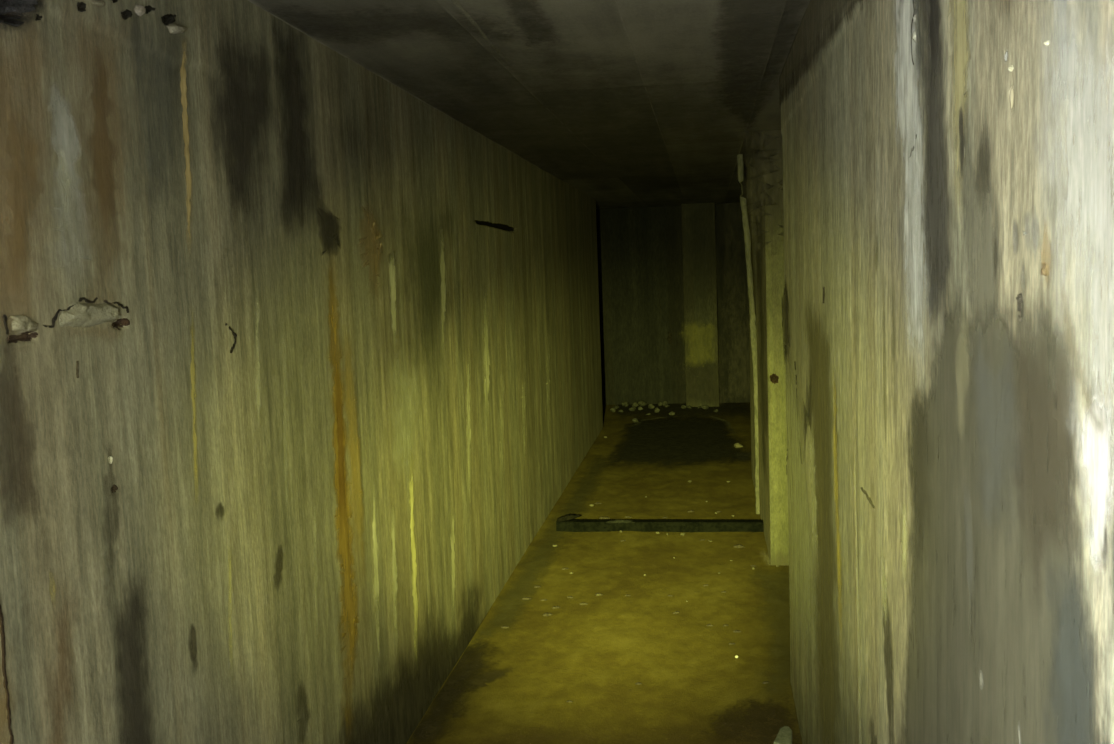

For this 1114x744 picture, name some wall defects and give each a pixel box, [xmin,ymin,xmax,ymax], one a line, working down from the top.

peeling [112,0,188,34]
corrosion [319,210,339,253]
crack [2,297,130,343]
crack [73,361,81,378]
water stain [882,0,1114,744]
corrosion [329,279,360,672]
crack [0,605,13,744]